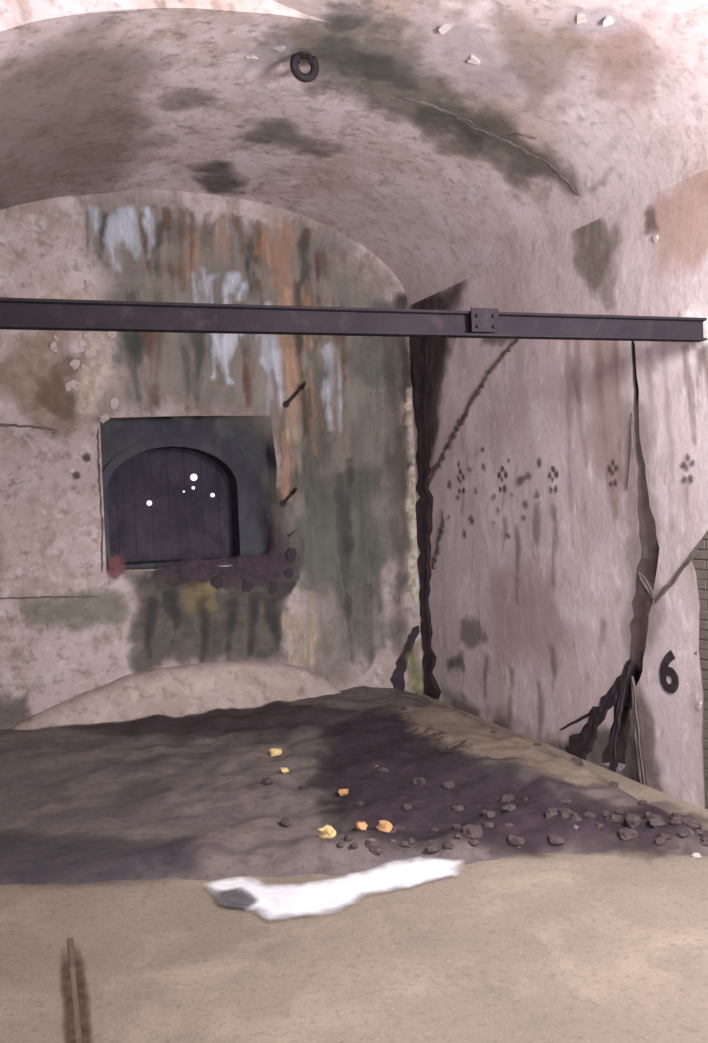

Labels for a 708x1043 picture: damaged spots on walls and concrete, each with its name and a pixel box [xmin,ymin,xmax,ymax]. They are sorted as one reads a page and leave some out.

damp [199,162,240,193]
damp [248,123,300,142]
damp [95,197,461,310]
rust [281,281,310,306]
damp [281,6,559,183]
rust [278,335,313,499]
damp [0,700,26,729]
damp [24,594,124,628]
damp [123,332,447,679]
crack [390,337,519,699]
crack [560,341,699,786]
flaking render [688,530,708,809]